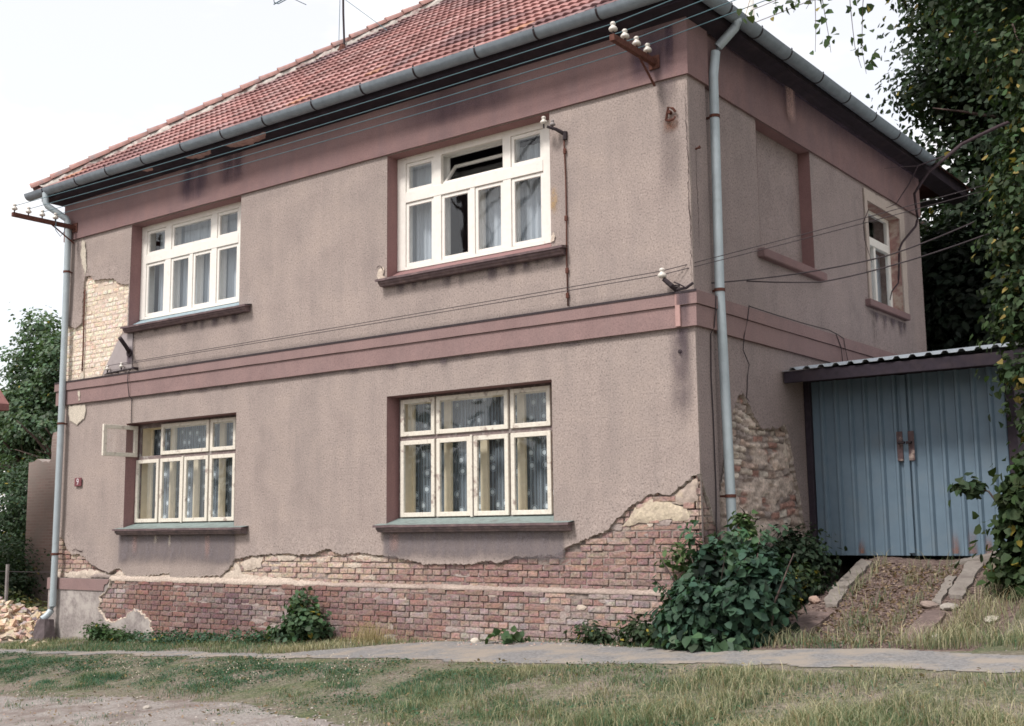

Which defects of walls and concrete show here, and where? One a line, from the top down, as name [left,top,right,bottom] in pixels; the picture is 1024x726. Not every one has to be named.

peeling [66,240,129,425]
flaking render [58,393,807,641]